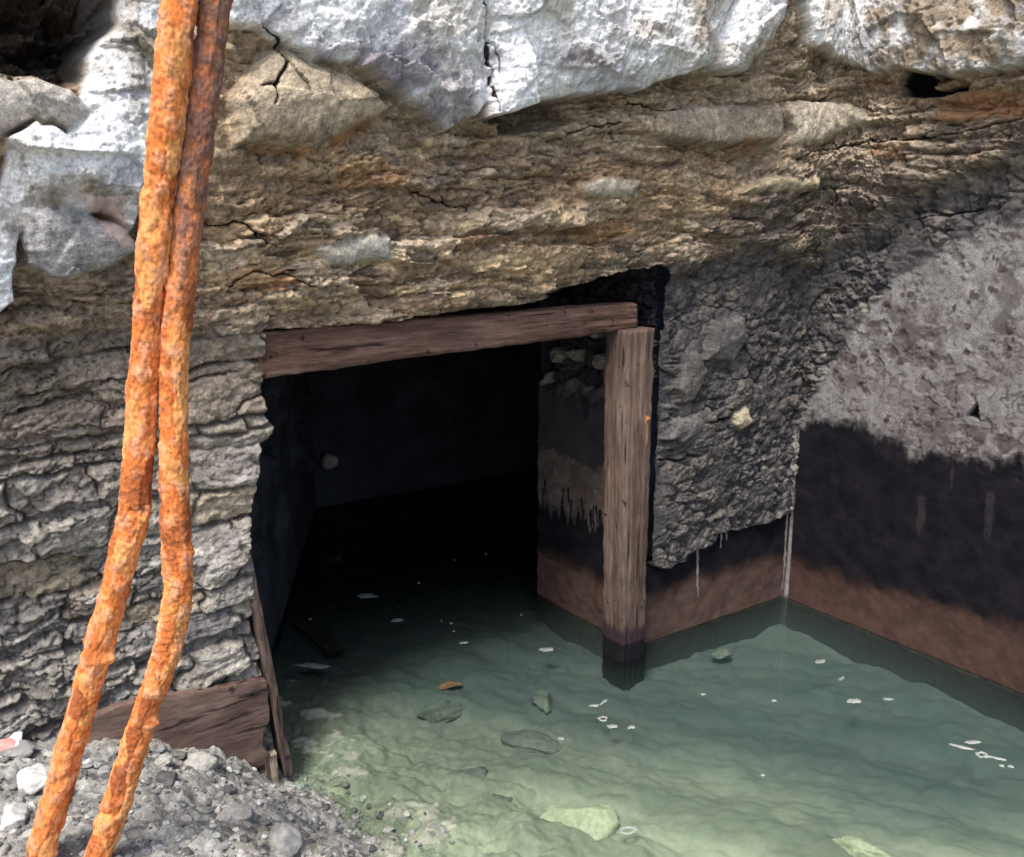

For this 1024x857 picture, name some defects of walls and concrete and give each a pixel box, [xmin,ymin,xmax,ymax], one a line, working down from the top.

crack [262,24,307,101]
crack [474,1,500,123]
rust [81,192,134,251]
crack [204,221,272,244]
water stain [537,504,604,584]
water stain [645,413,1024,632]